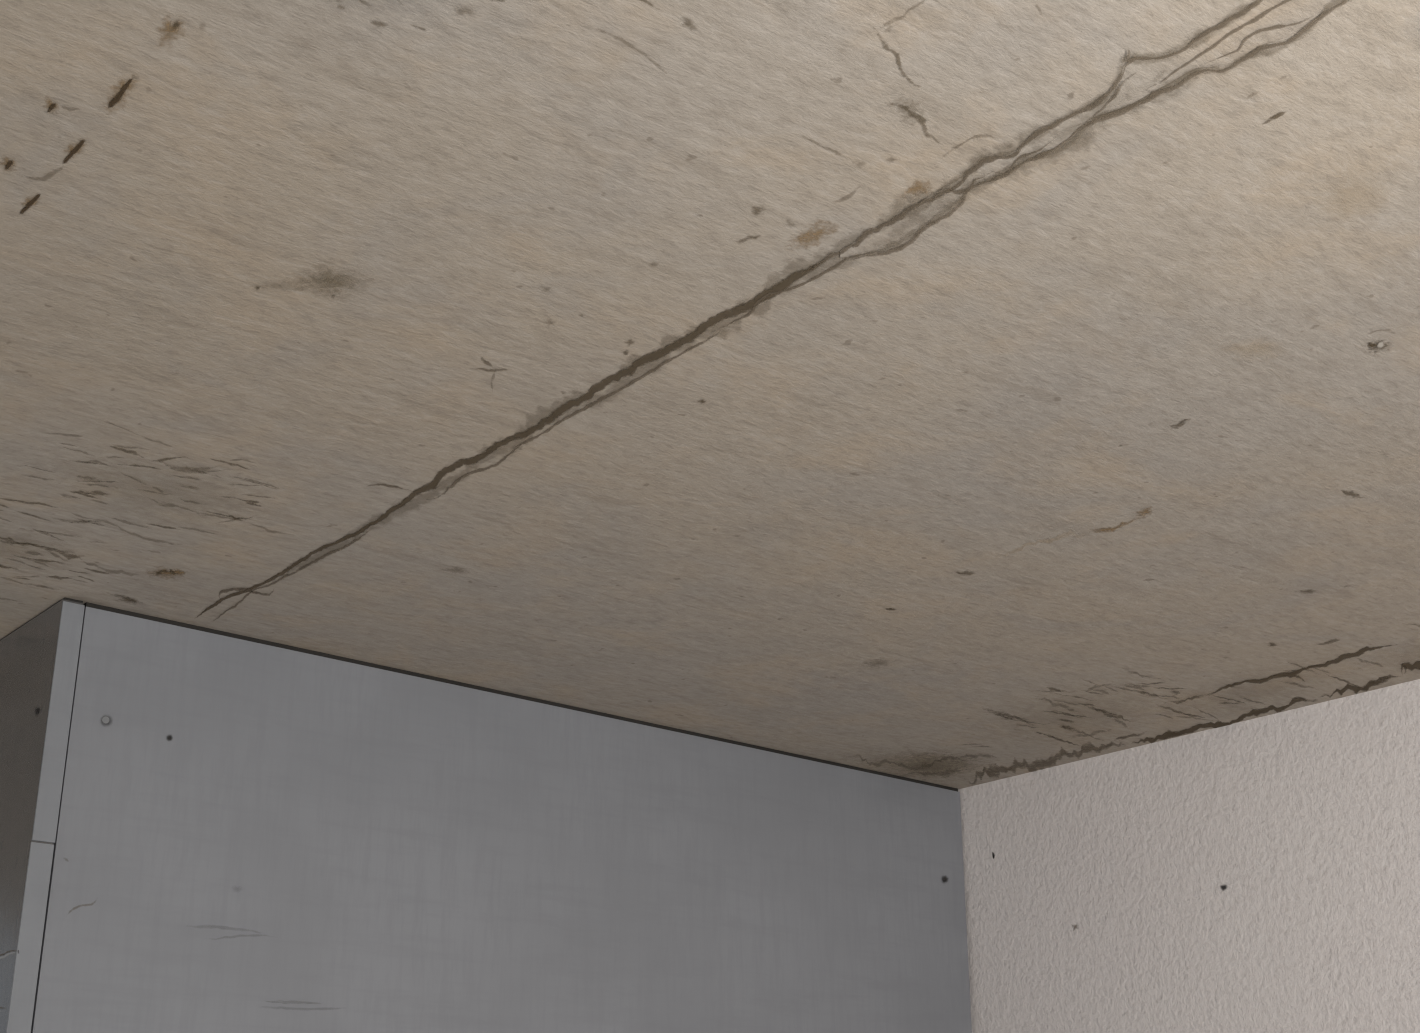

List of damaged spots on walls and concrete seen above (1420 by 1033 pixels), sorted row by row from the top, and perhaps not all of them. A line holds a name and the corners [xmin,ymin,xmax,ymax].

crack [197,0,1348,620]
water stain [1,538,107,581]
crack [1179,640,1391,703]